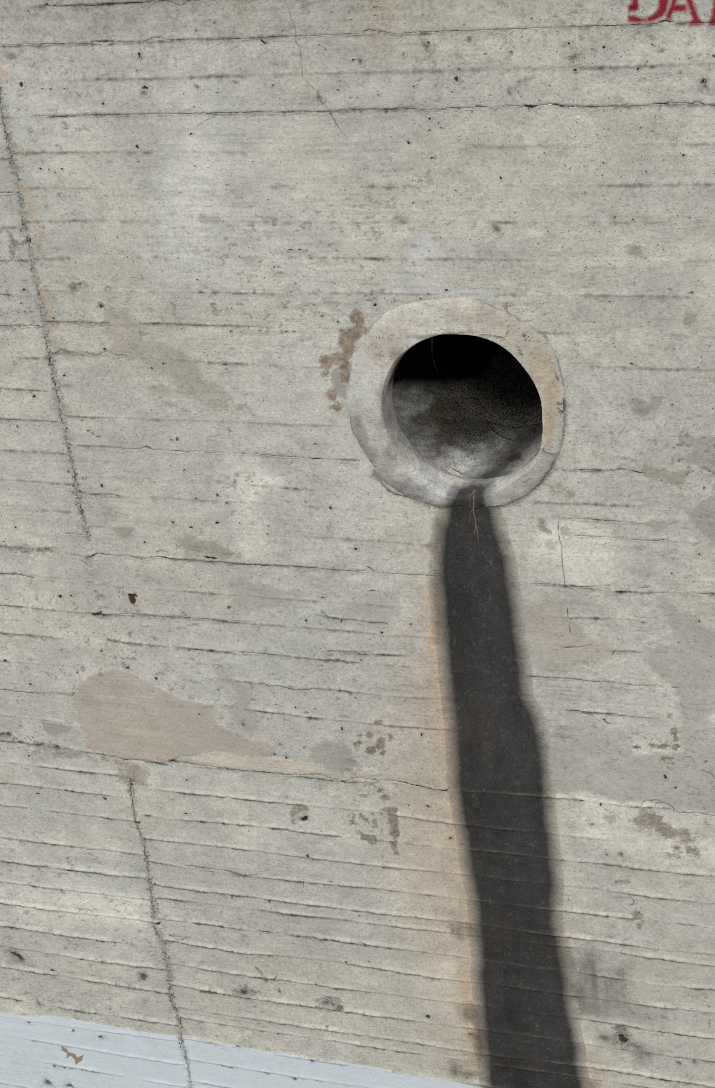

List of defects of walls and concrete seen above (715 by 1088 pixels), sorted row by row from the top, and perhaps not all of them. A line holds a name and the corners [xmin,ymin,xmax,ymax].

crack [0,0,715,656]
crack [1,689,75,697]
crack [194,649,318,694]
water stain [356,423,715,1088]
crack [1,843,93,873]